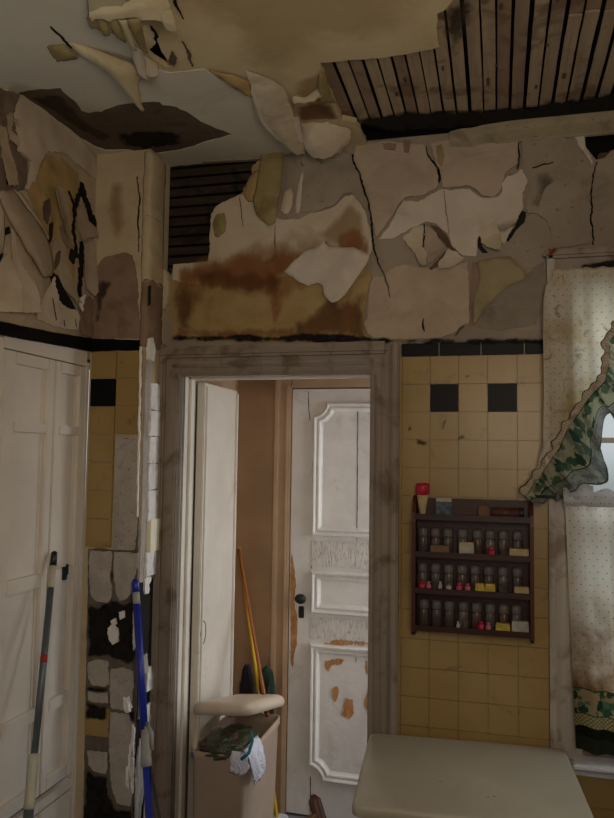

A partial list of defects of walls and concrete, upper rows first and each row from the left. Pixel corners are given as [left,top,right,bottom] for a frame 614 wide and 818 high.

crack [352,154,380,266]
crack [426,147,441,183]
crack [517,142,554,170]
crack [590,162,598,245]
spalling [0,0,544,726]
spalling [83,347,145,818]